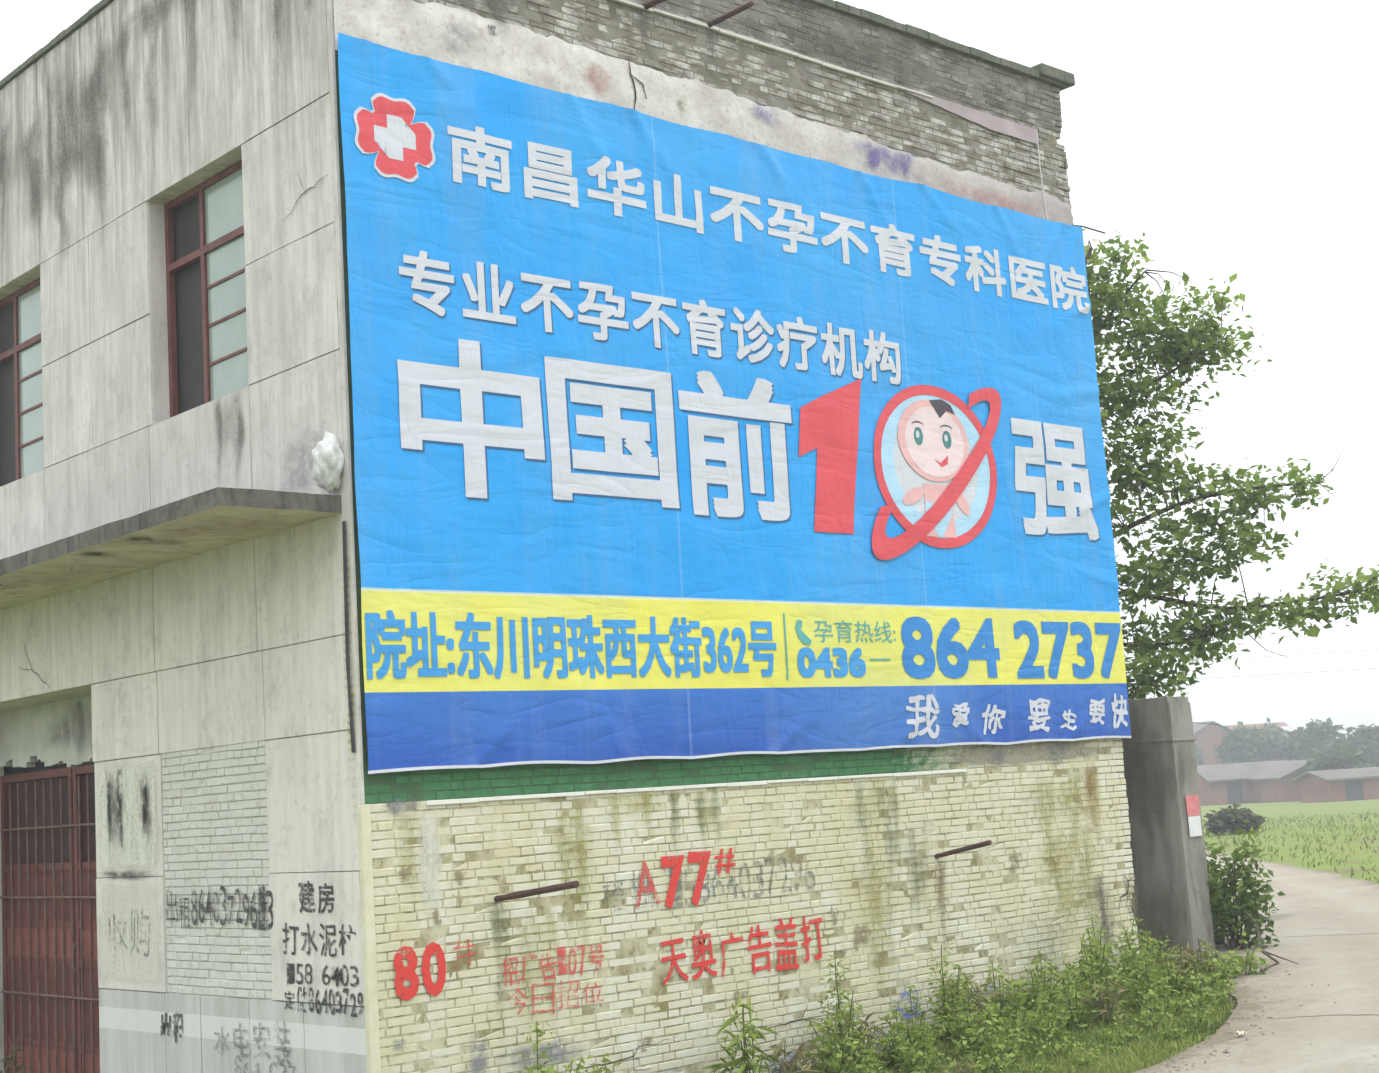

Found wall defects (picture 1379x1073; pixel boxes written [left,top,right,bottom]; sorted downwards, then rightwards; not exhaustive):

leakage [48,57,103,225]
leakage [107,771,121,834]